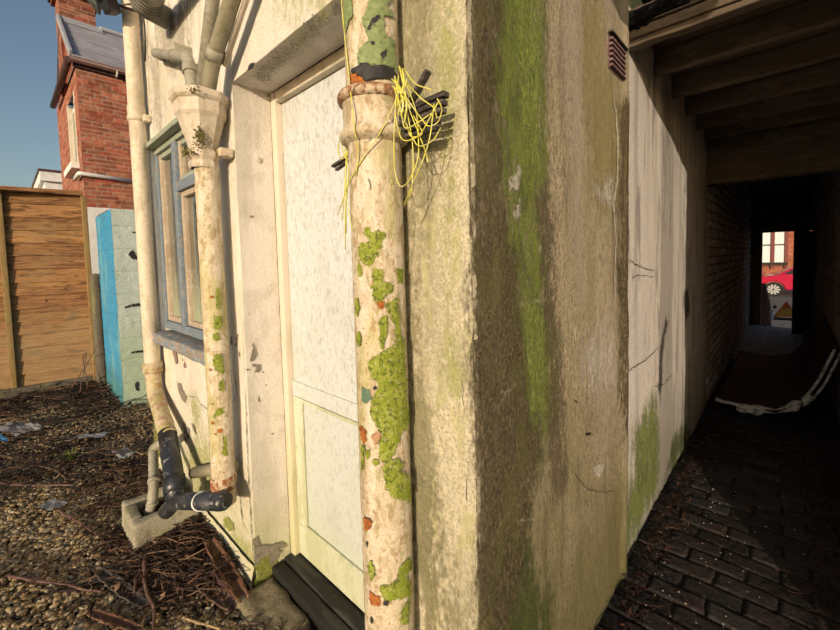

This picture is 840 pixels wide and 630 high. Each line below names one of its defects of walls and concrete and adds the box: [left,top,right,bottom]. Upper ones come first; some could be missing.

peeling [343,0,353,32]
peeling [350,0,398,81]
leakage [464,0,568,630]
spalling [252,536,286,566]